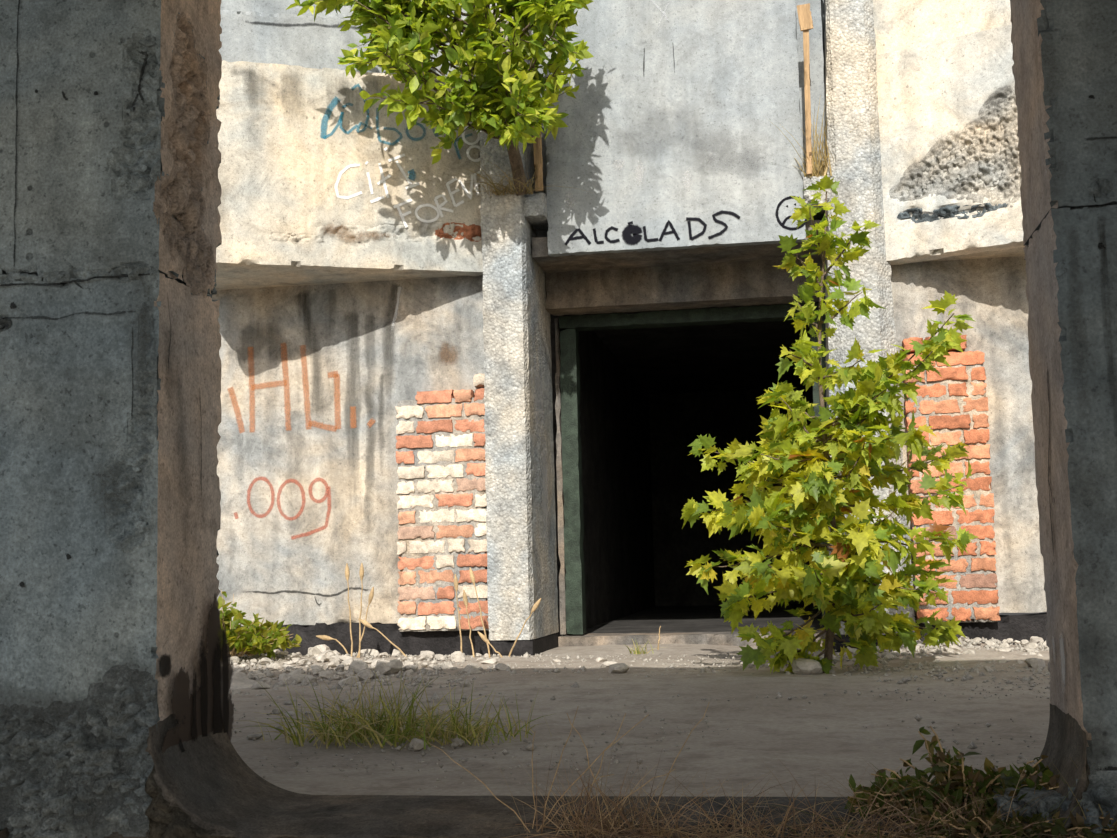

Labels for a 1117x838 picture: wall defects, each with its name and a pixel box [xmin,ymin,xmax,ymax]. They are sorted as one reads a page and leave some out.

crack [0,0,150,416]
spalling [109,12,215,299]
spalling [889,86,1021,223]
crack [1069,195,1117,210]
crack [1087,134,1117,142]
spalling [0,302,16,332]
spalling [101,269,159,553]
spalling [0,594,234,838]
spalling [1068,771,1117,838]